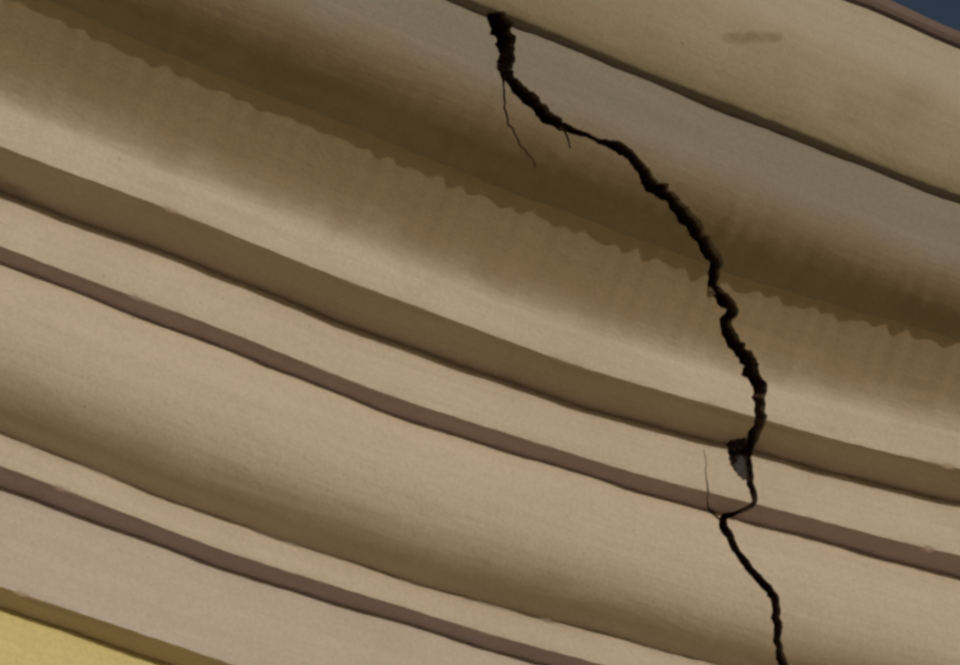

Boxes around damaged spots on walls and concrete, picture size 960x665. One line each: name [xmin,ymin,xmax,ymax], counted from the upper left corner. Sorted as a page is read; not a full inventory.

crack [487,11,788,665]